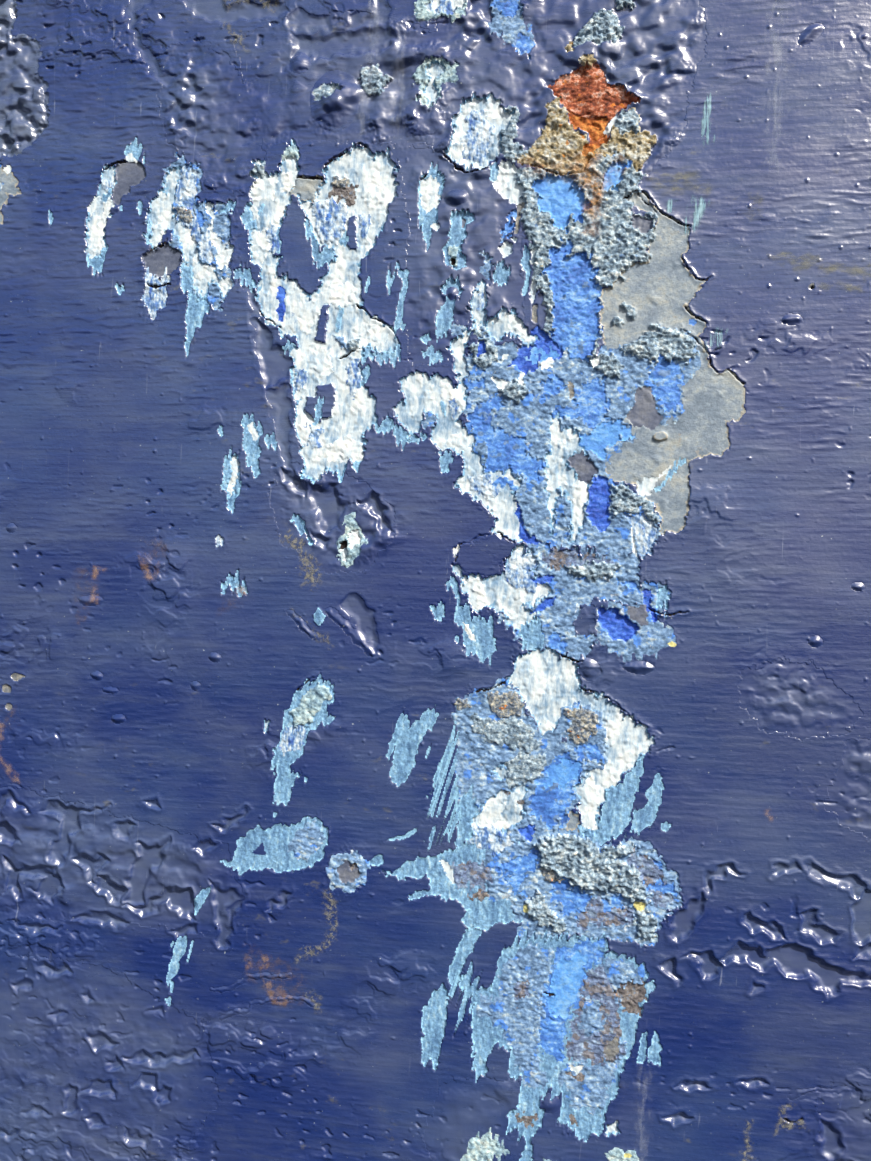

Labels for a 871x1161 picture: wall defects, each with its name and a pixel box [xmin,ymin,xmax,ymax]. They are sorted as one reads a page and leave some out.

peeling [412,56,459,108]
rust [515,54,657,206]
peeling [0,164,22,224]
peeling [85,93,746,1161]
peeling [0,790,245,1014]
peeling [659,909,871,994]
peeling [772,862,871,957]
peeling [25,1033,198,1127]
peeling [818,1122,843,1161]